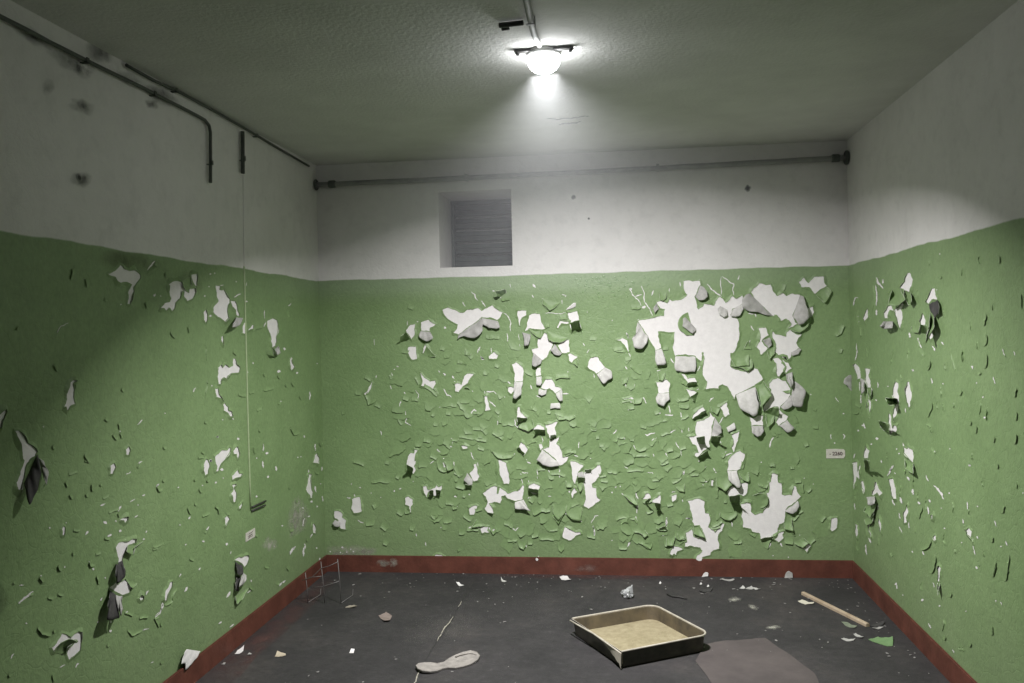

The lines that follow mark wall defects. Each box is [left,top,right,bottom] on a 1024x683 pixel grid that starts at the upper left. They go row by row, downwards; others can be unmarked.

peeling [863,271,939,342]
peeling [202,283,295,420]
peeling [0,404,49,505]
peeling [200,443,243,529]
peeling [332,495,364,532]
peeling [386,274,832,587]
peeling [852,443,910,541]
peeling [852,361,914,437]
peeling [107,512,145,620]
peeling [234,552,250,604]
peeling [49,627,84,663]
peeling [181,649,200,670]